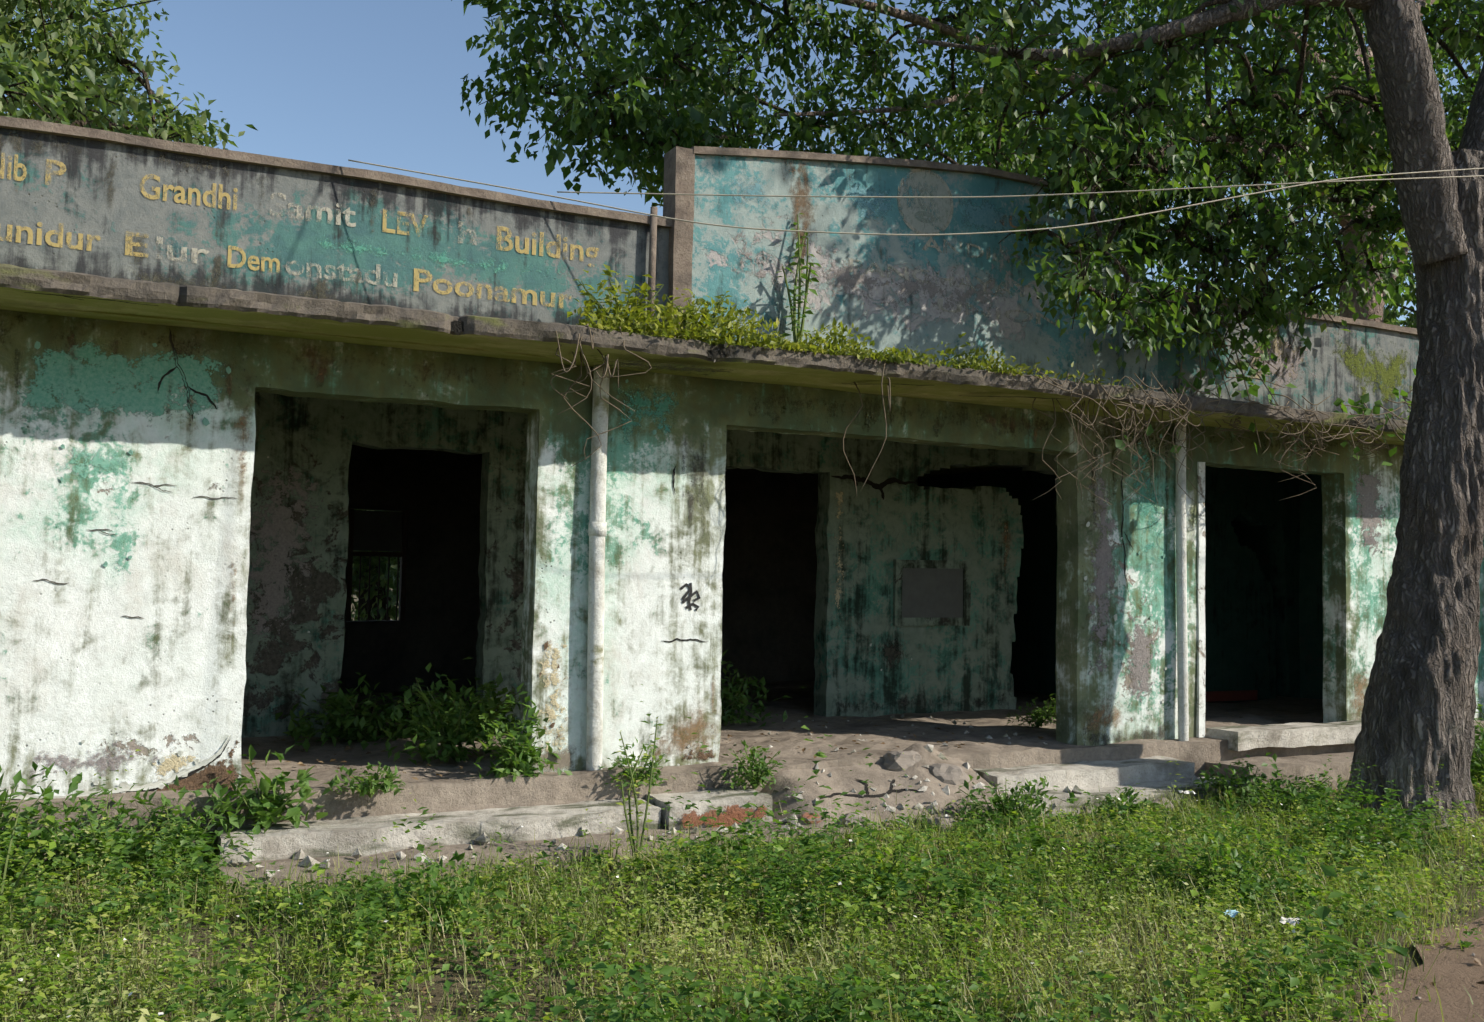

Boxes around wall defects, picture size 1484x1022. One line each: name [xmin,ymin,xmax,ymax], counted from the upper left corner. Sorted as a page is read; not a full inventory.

peeling [959,198,1019,237]
peeling [733,233,1023,319]
crack [24,292,217,422]
peeling [17,341,231,426]
peeling [57,444,133,482]
damp [683,442,706,520]
crack [831,474,917,500]
spalling [0,735,240,800]
spalling [677,745,715,766]